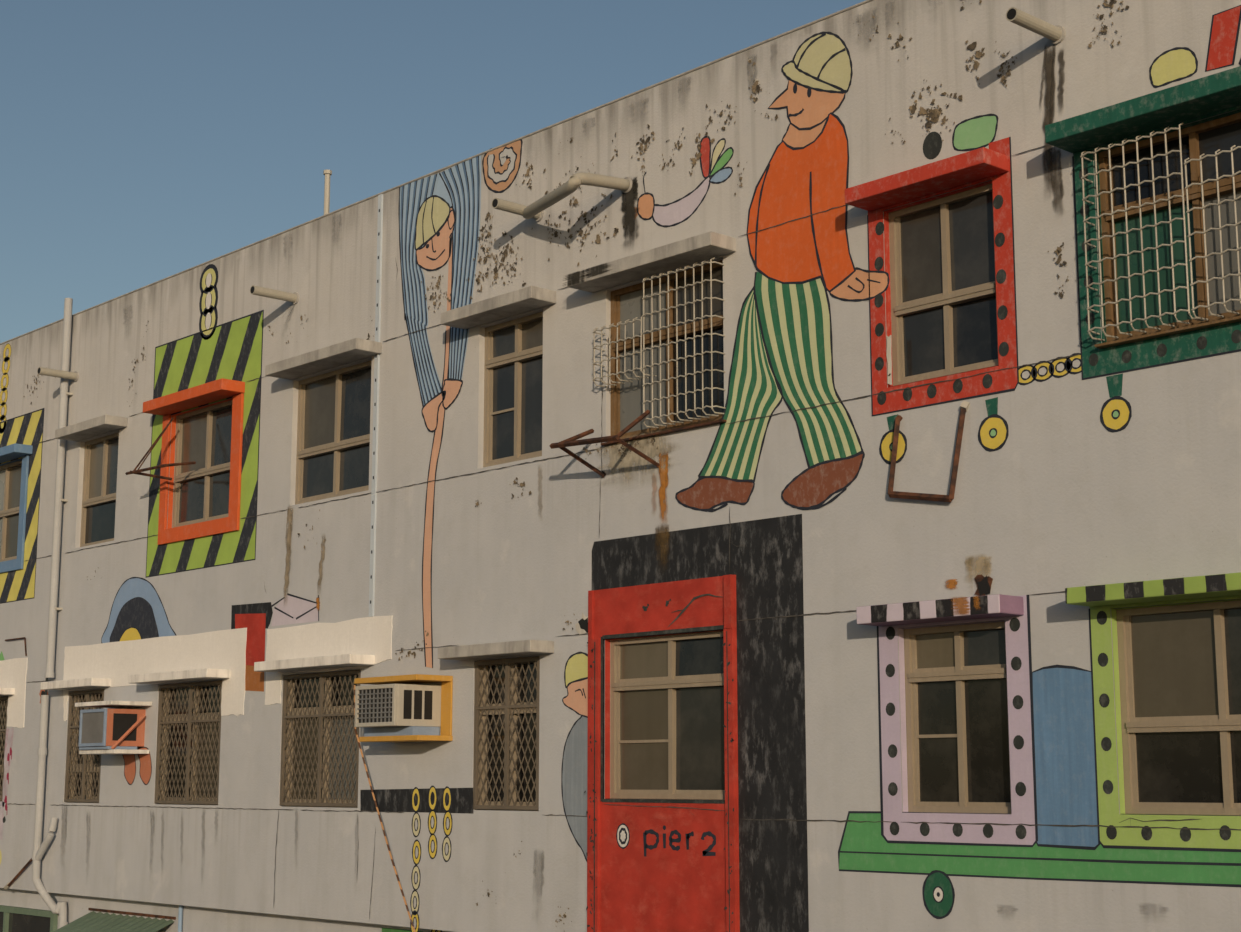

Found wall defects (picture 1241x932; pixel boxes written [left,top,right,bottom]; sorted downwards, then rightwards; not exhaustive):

peeling [1088,0,1129,48]
peeling [965,40,1017,87]
peeling [909,80,962,141]
leakage [1040,46,1065,207]
peeling [516,162,594,194]
peeling [461,212,526,299]
peeling [530,186,625,266]
rust [656,453,669,559]
rust [946,579,979,614]